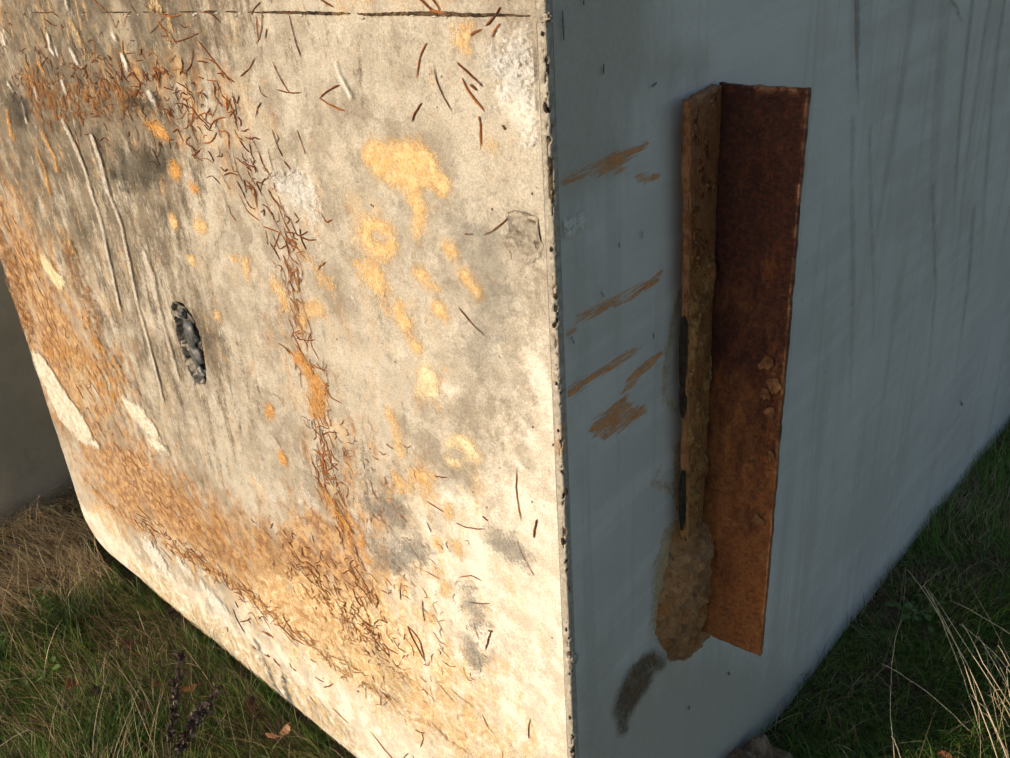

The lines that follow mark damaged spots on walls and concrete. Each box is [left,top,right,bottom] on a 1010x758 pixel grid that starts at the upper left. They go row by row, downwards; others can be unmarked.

crack [82,10,529,20]
corrosion [561,142,648,185]
spalling [171,301,206,384]
corrosion [0,0,500,756]
corrosion [568,349,636,397]
corrosion [590,351,662,440]
corrosion [685,91,719,541]
leakage [615,653,665,733]